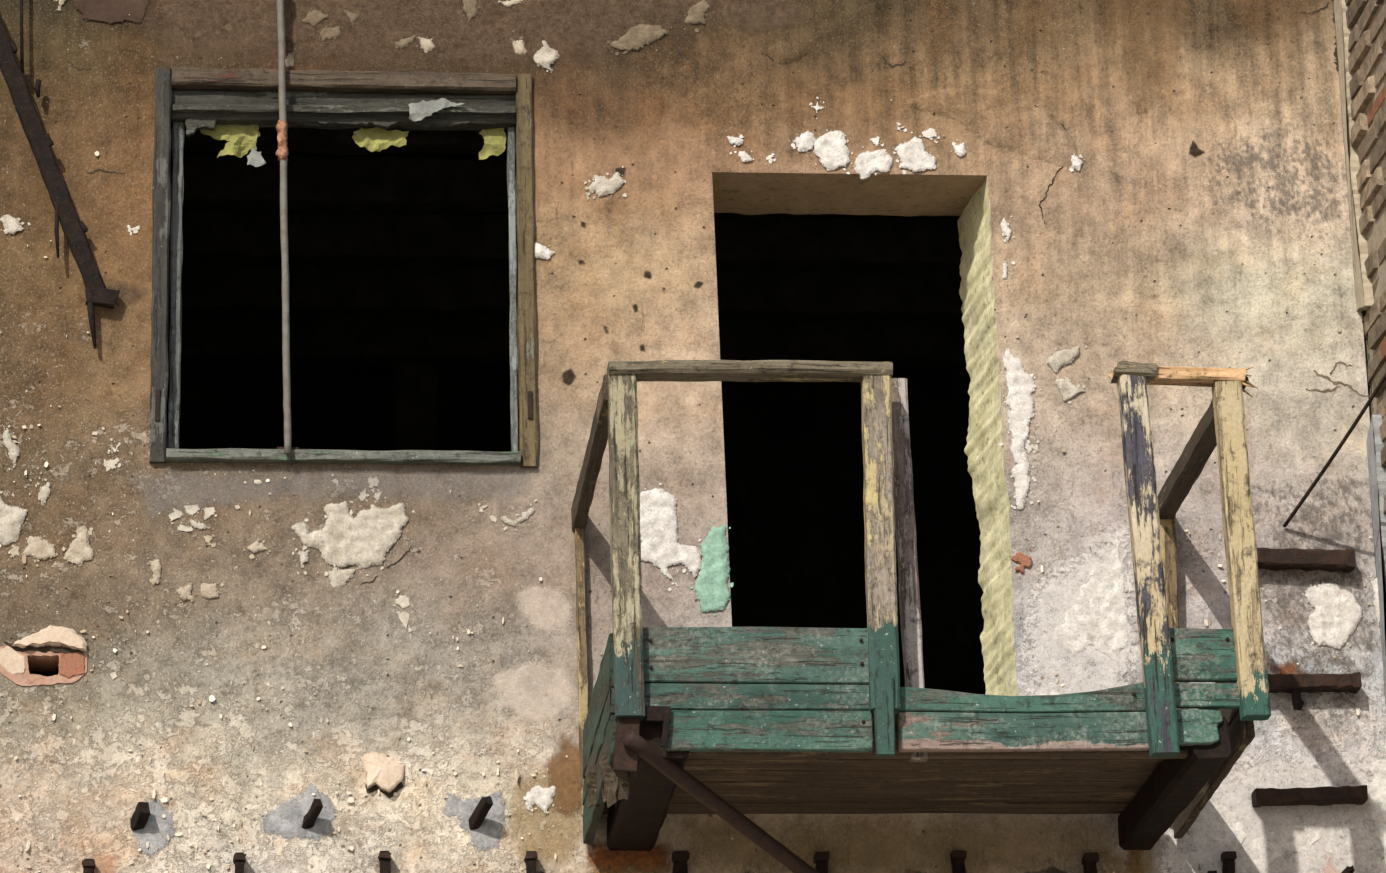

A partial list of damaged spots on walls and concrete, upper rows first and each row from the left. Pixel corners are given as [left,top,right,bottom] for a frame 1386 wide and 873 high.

crack [1301,0,1339,71]
peeling [791,97,966,179]
crack [1039,166,1064,224]
crack [1306,310,1374,415]
peeling [997,335,1087,515]
peeling [0,424,95,577]
peeling [291,474,416,588]
peeling [640,483,734,616]
peeling [1288,575,1380,658]
spalling [0,625,159,720]
corrosion [588,844,668,873]
peeling [1360,758,1386,873]